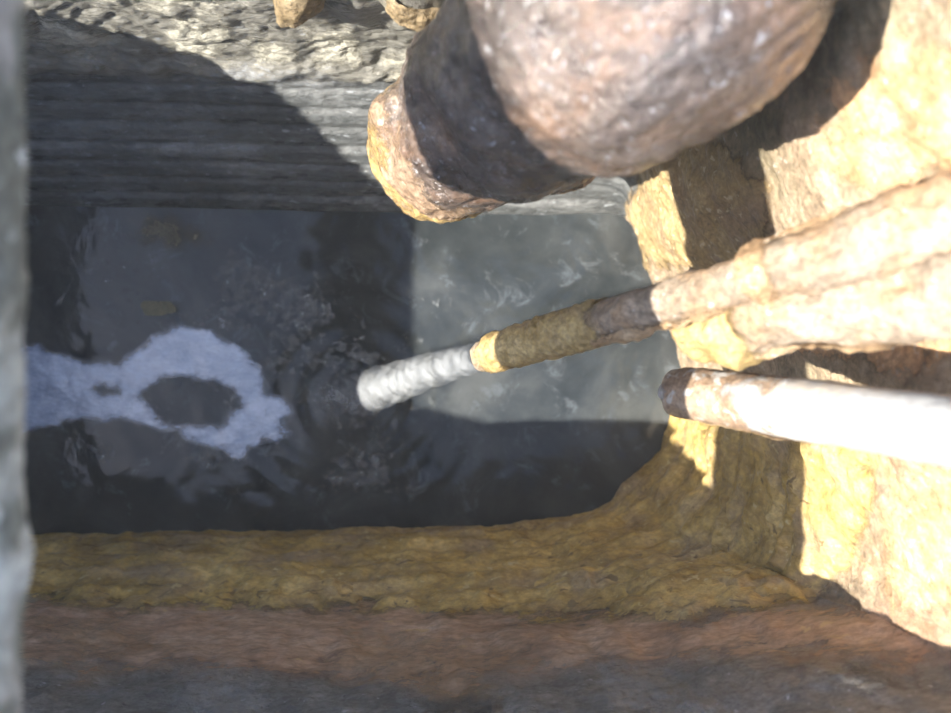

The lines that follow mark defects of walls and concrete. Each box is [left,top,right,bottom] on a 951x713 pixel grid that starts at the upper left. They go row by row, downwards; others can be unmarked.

water stain [28,415,877,624]